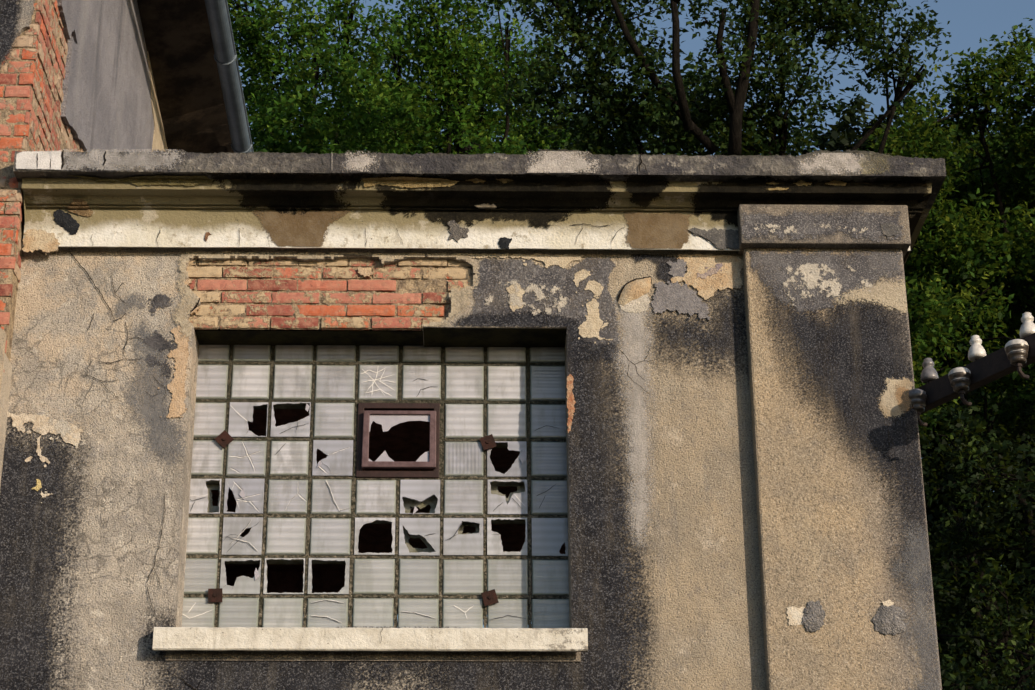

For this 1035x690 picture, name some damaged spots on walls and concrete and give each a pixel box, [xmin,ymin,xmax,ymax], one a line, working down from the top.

flaking render [0,0,93,353]
crack [70,237,167,400]
flaking render [158,220,613,419]
peeling [650,227,744,324]
peeling [783,263,907,313]
peeling [7,410,86,467]
damp [143,173,942,690]
spalling [566,374,576,433]
damp [0,412,92,690]
peeling [786,606,805,626]